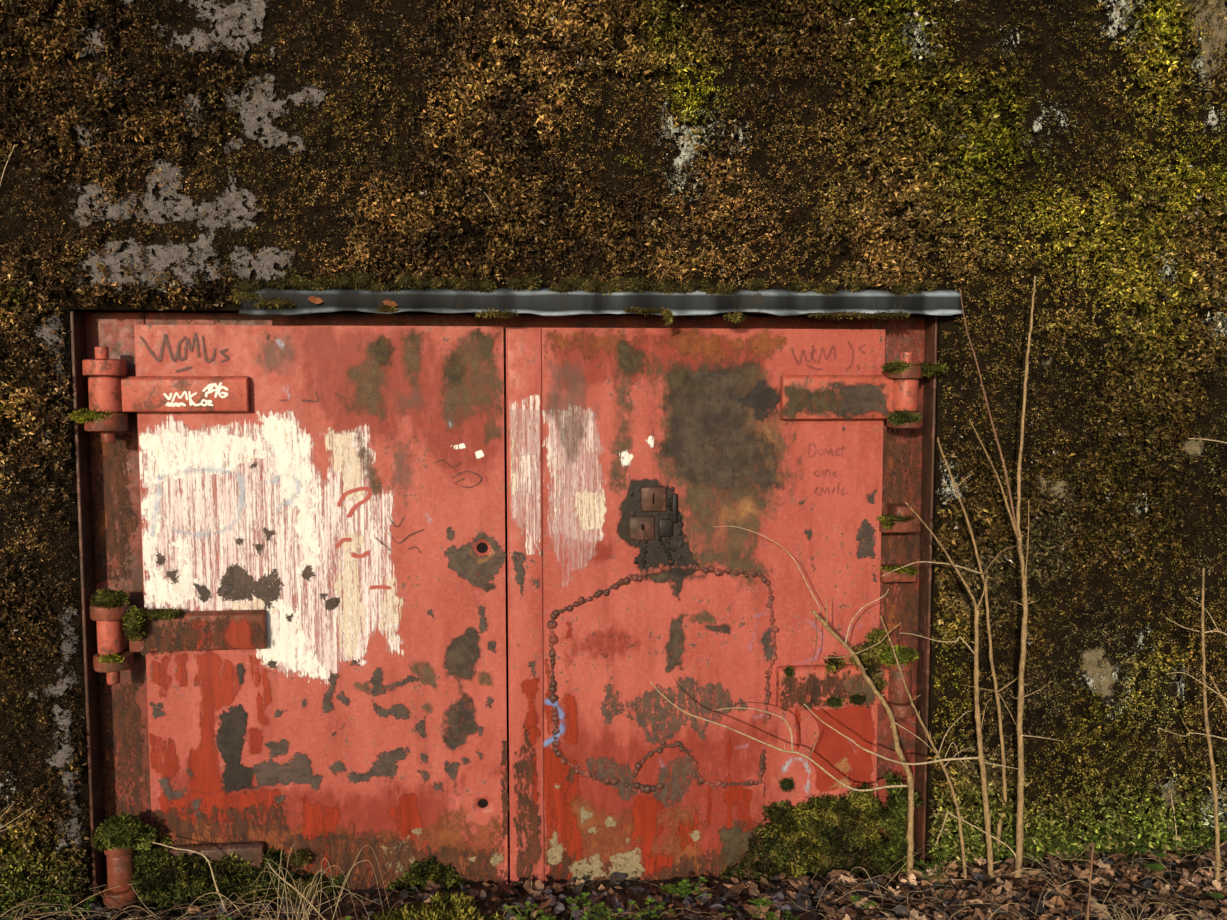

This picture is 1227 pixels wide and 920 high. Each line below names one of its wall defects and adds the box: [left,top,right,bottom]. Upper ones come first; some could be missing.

peeling [70,0,327,295]
corrosion [90,433,138,588]
peeling [156,552,179,584]
peeling [194,527,294,622]
peeling [301,565,316,581]
peeling [319,593,340,611]
peeling [476,604,496,654]
peeling [216,659,484,815]
corrosion [99,613,762,889]
peeling [585,754,698,810]
peeling [601,676,748,747]